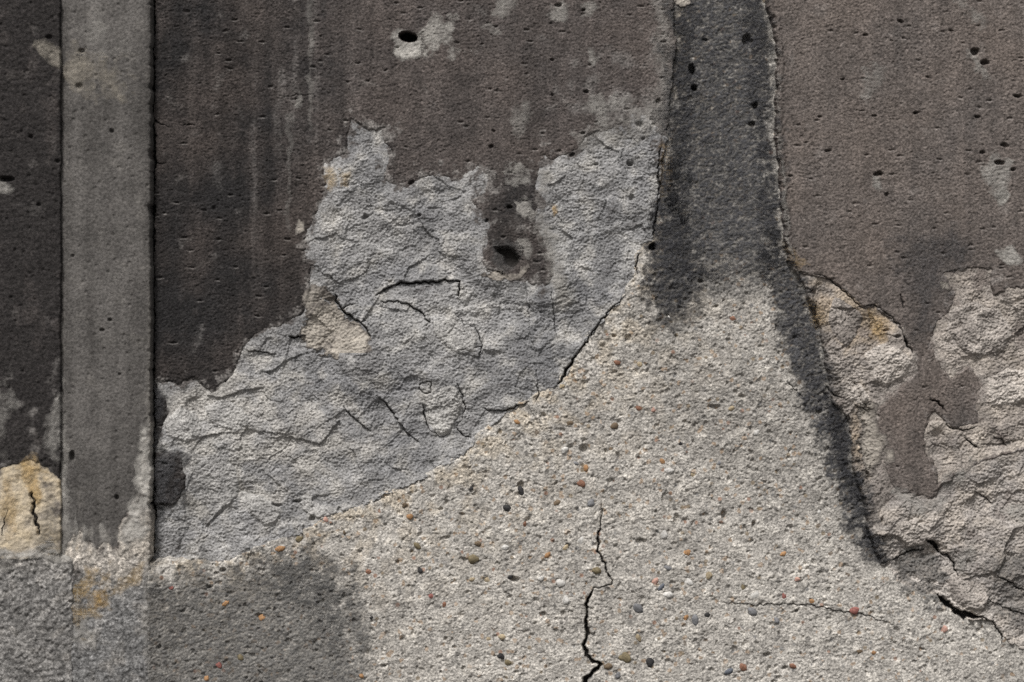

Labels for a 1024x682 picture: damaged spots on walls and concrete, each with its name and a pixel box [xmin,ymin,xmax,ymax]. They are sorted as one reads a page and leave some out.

crack [1,495,40,535]
spalling [0,114,669,682]
crack [335,279,483,353]
crack [381,289,625,441]
crack [582,504,613,682]
leakage [642,0,889,563]
spalling [788,262,1024,650]
crack [893,540,958,576]
crack [937,576,1024,643]